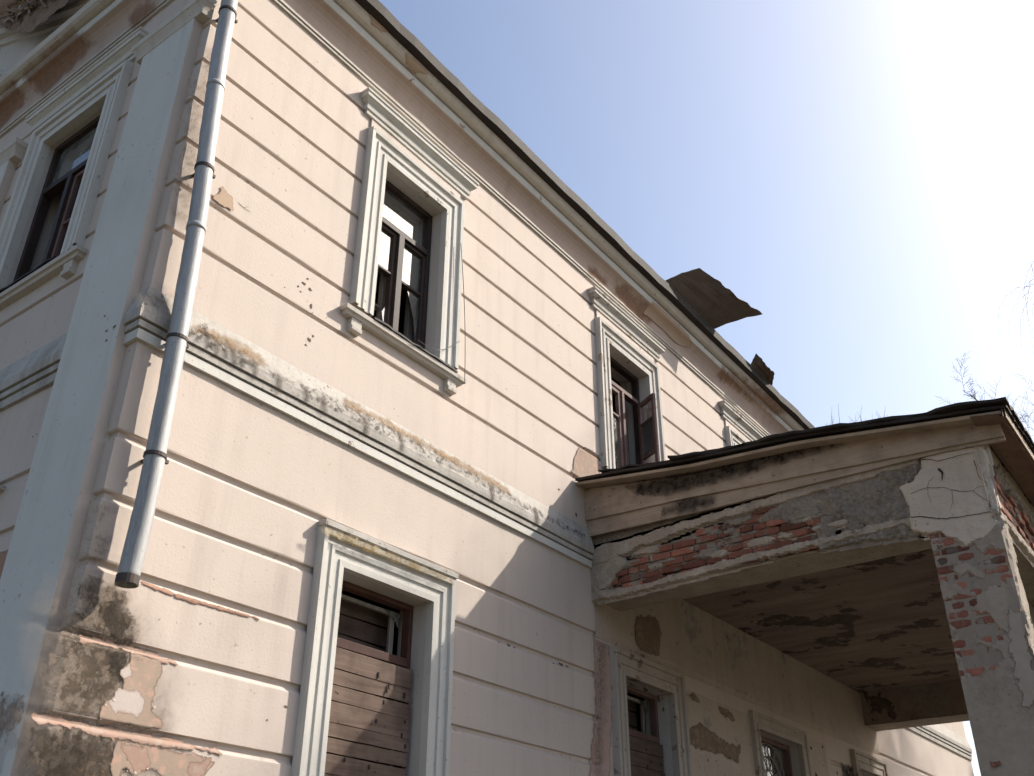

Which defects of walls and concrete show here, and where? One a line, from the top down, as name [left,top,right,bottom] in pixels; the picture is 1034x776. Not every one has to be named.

peeling [212,186,234,211]
water stain [188,323,585,536]
mould [29,578,139,776]
peeling [0,634,222,776]
peeling [141,581,260,620]
flaking render [609,459,1034,776]